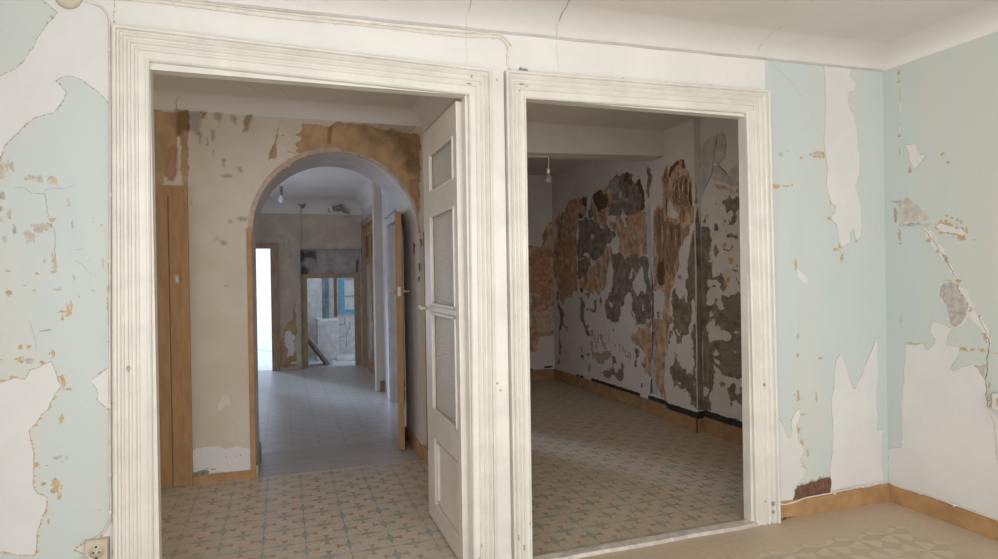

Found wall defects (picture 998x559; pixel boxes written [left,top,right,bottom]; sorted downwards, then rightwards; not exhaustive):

peeling [0,344,72,558]
peeling [0,0,115,243]
peeling [154,110,190,186]
peeling [268,121,421,214]
flaking render [528,133,743,422]
peeling [800,66,862,264]
peeling [765,281,998,521]
peeling [891,198,976,253]
crack [924,228,998,460]